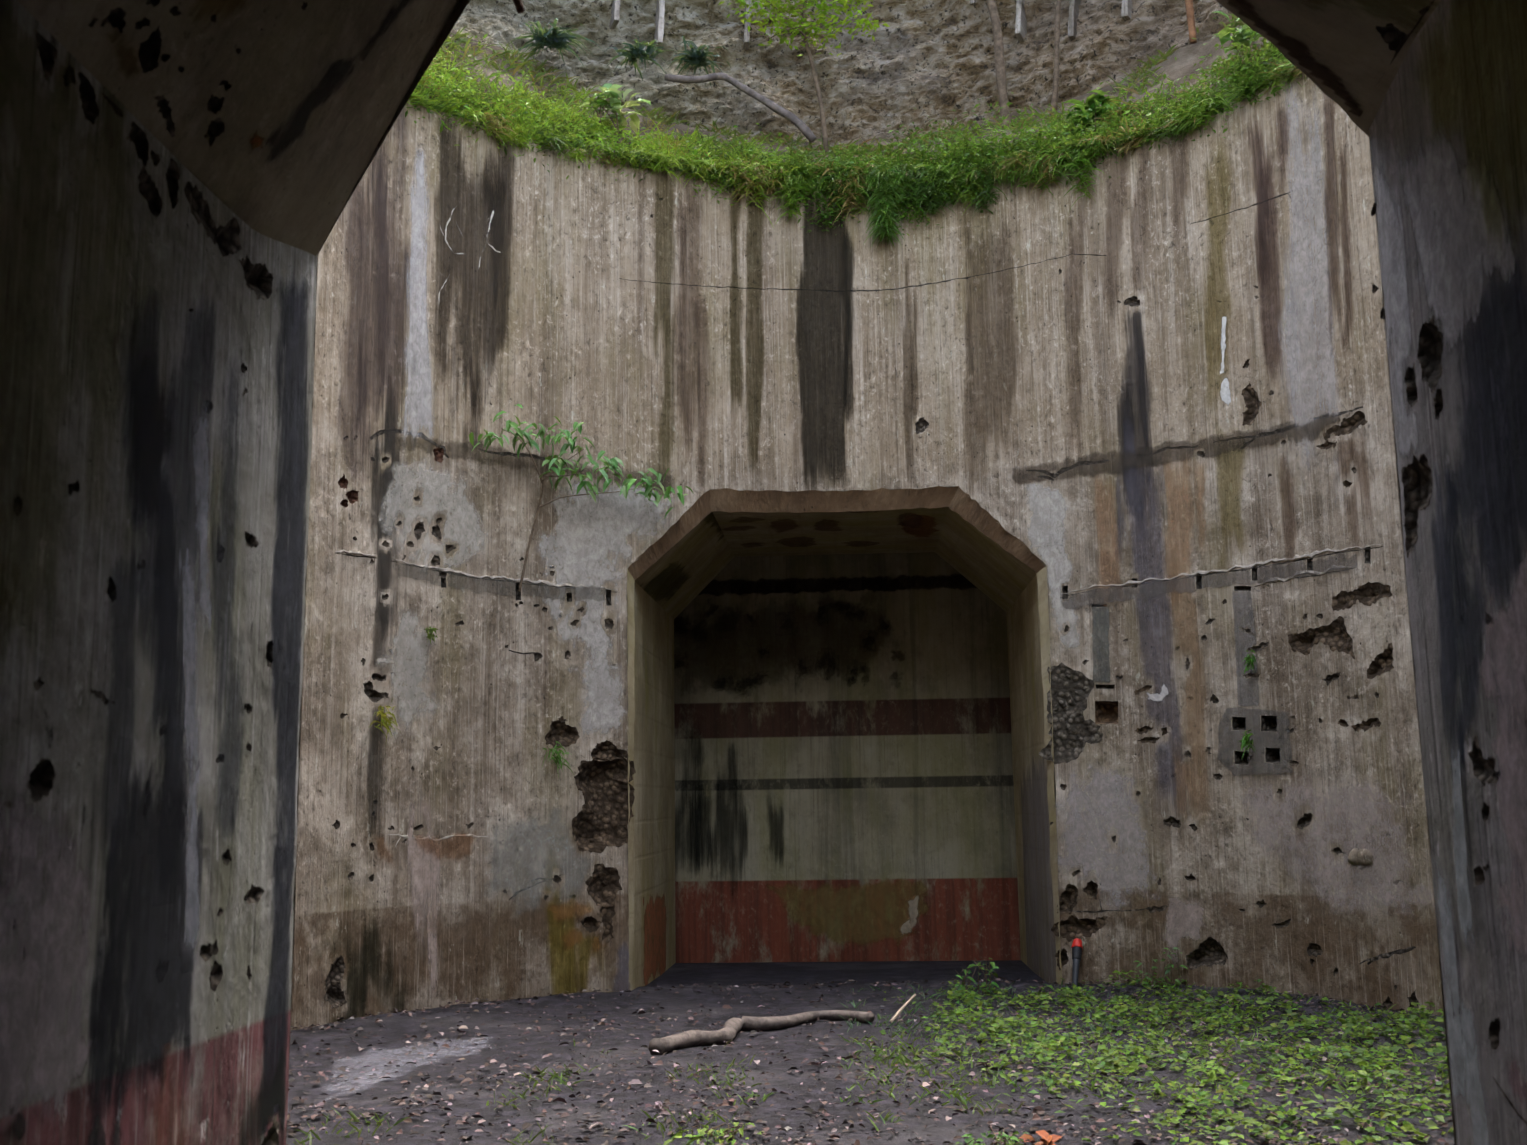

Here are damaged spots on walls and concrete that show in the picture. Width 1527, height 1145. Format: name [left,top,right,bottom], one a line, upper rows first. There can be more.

water stain [798,210,852,480]
spalling [515,601,614,630]
spalling [1242,628,1269,653]
spalling [1288,582,1394,699]
spalling [1115,675,1153,696]
water stain [1147,685,1168,701]
spalling [1039,660,1103,764]
spalling [1134,726,1168,744]
spalling [1319,718,1381,732]
spalling [544,716,636,941]
spalling [324,956,347,1009]
spalling [261,1114,279,1145]